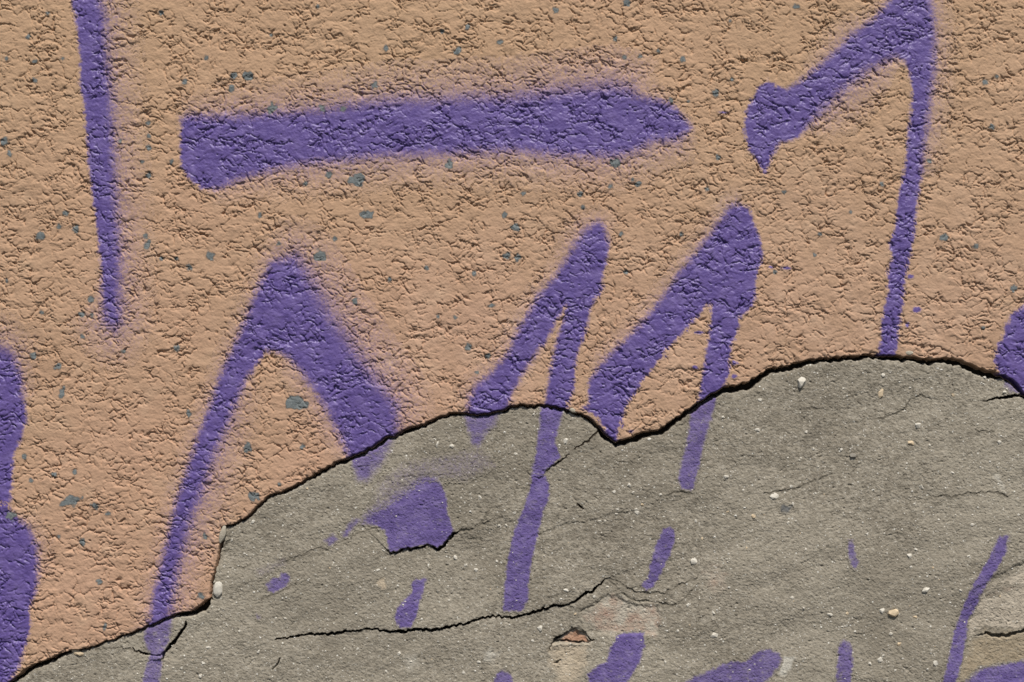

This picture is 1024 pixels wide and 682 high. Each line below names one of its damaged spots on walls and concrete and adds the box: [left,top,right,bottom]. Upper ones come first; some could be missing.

crack [521,356,1024,476]
peeling [59,495,111,515]
crack [221,413,462,569]
crack [261,504,503,601]
spalling [161,357,1024,682]
spalling [15,623,149,682]
crack [12,598,212,682]
crack [275,576,705,663]